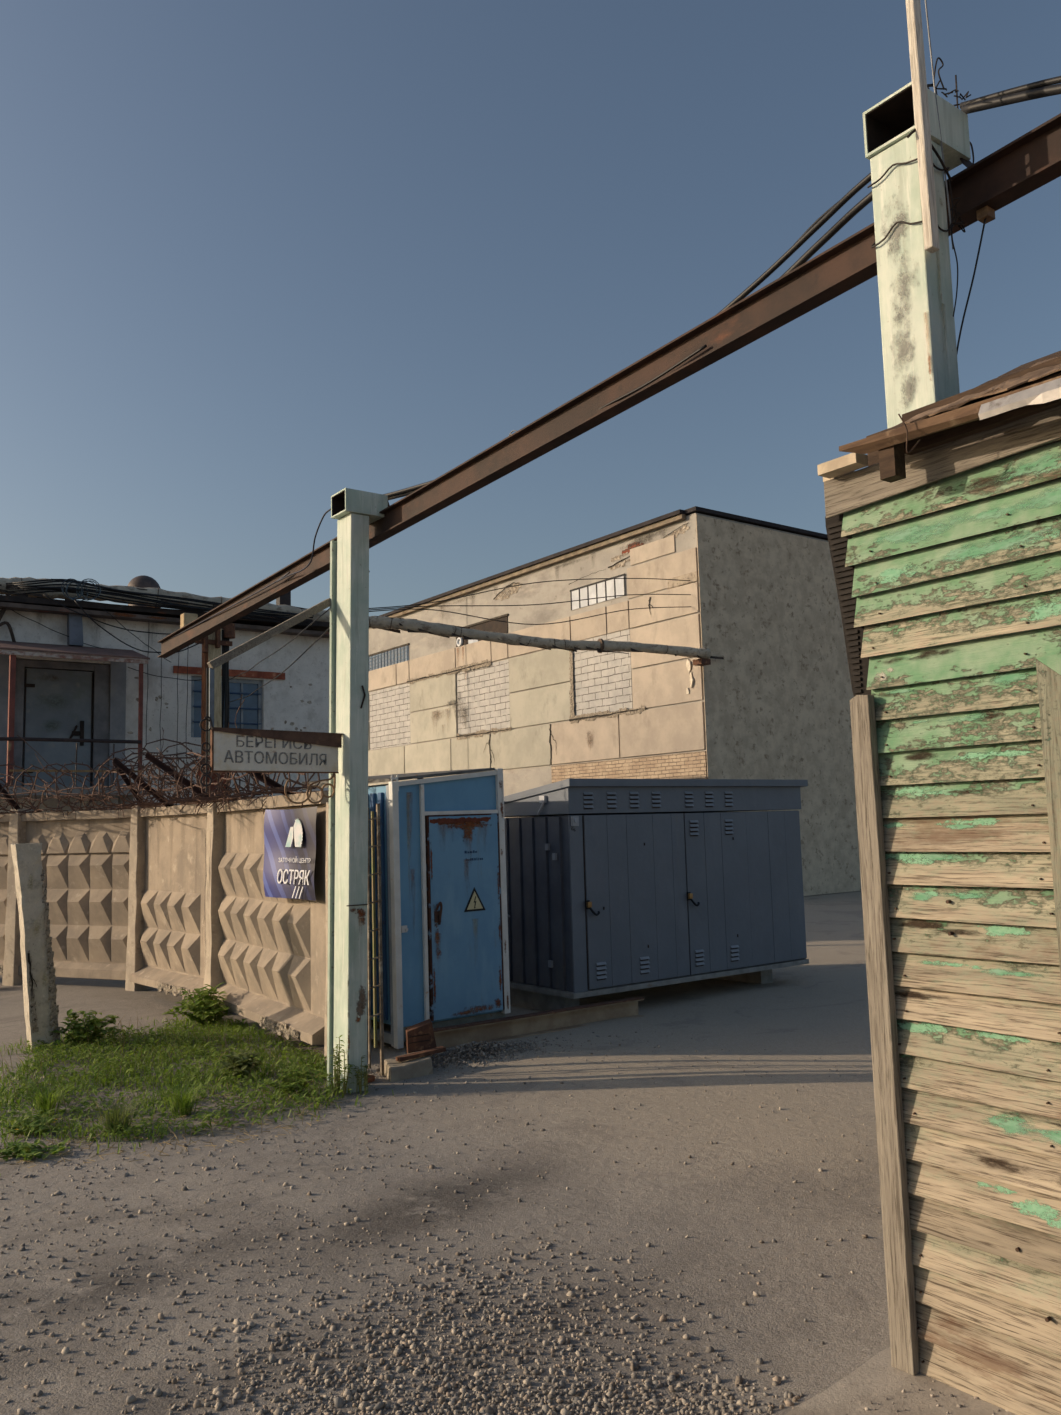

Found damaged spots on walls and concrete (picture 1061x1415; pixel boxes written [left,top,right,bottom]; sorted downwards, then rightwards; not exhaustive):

peeling [1001,452,1061,481]
peeling [942,527,1059,562]
peeling [1019,600,1061,621]
peeling [906,752,932,760]
peeling [953,750,1031,760]
peeling [895,785,973,797]
corrosion [430,803,503,842]
peeling [936,817,1000,829]
peeling [885,852,962,865]
peeling [903,919,1031,936]
peeling [988,1112,1061,1144]
peeling [977,1182,1061,1229]